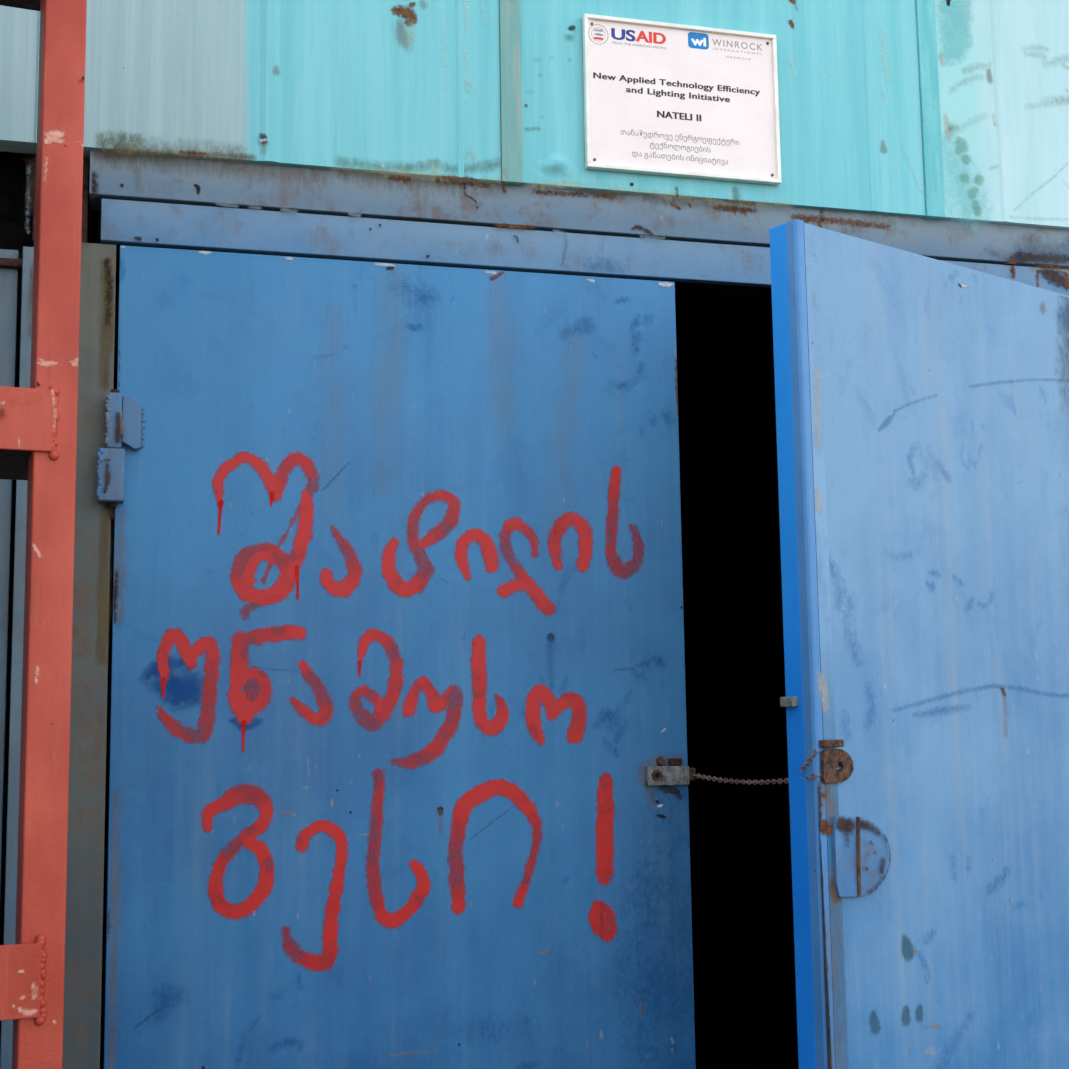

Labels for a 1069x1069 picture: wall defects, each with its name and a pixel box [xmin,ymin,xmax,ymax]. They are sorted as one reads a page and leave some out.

rust [391,2,417,26]
peeling [44,130,83,147]
rust [1006,252,1069,290]
rust [818,783,891,1069]